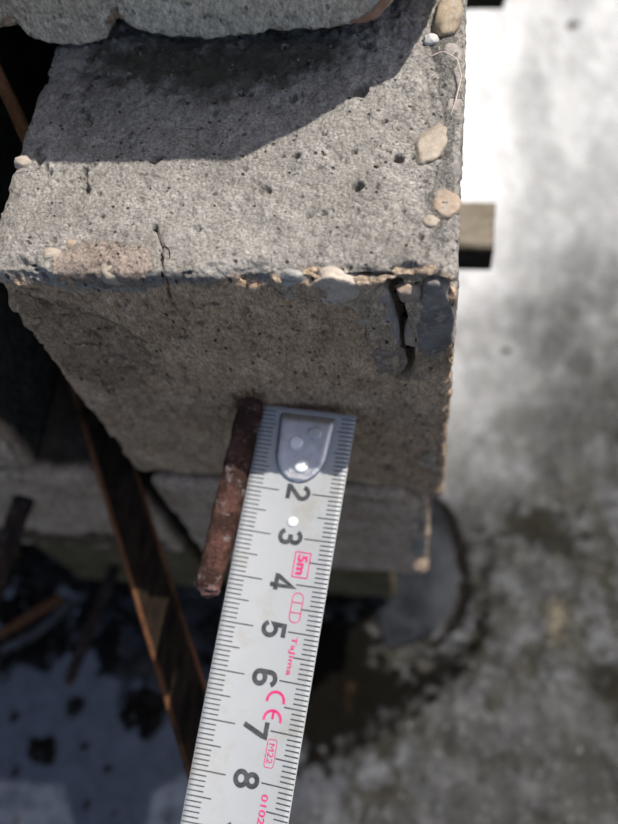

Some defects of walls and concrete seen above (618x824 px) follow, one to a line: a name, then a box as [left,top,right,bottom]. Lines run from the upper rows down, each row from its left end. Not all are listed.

crack [156,230,171,298]
spalling [269,264,457,380]